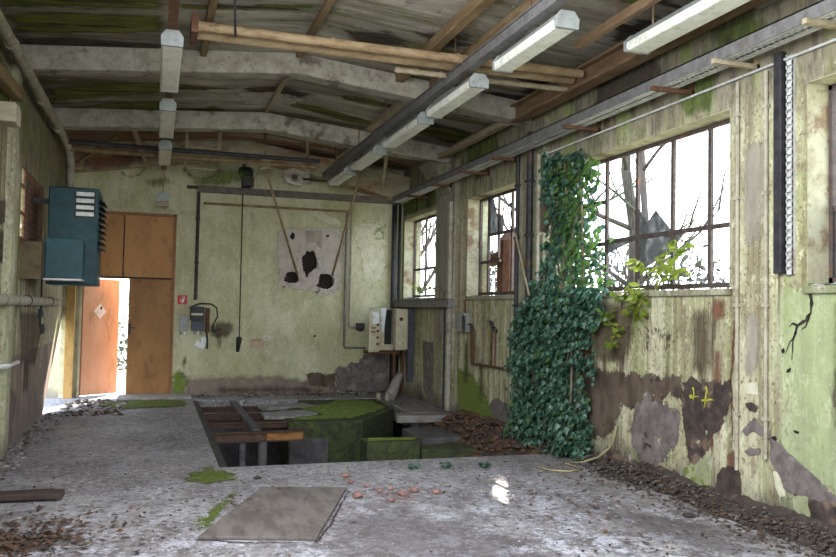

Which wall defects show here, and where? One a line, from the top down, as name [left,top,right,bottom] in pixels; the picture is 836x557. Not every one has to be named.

peeling [277,206,387,296]
water stain [21,311,40,393]
spalling [305,354,389,393]
crack [785,294,814,354]
spalling [581,313,836,526]